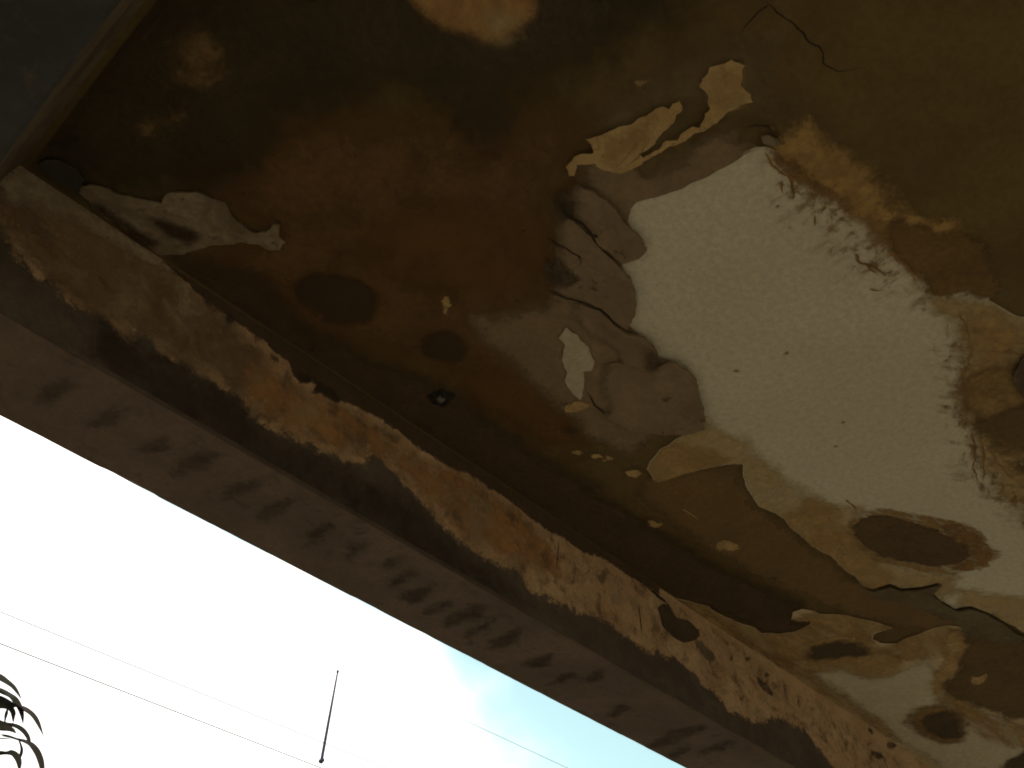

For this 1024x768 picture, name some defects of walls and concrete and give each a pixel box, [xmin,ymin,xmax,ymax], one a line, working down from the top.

crack [740,1,859,72]
water stain [46,0,685,189]
peeling [0,168,285,269]
crack [547,203,614,260]
rust [765,116,1002,300]
crack [547,289,611,318]
flaking render [470,48,1024,768]
water stain [0,174,899,768]
water stain [845,499,1000,576]
water stain [904,630,1024,744]